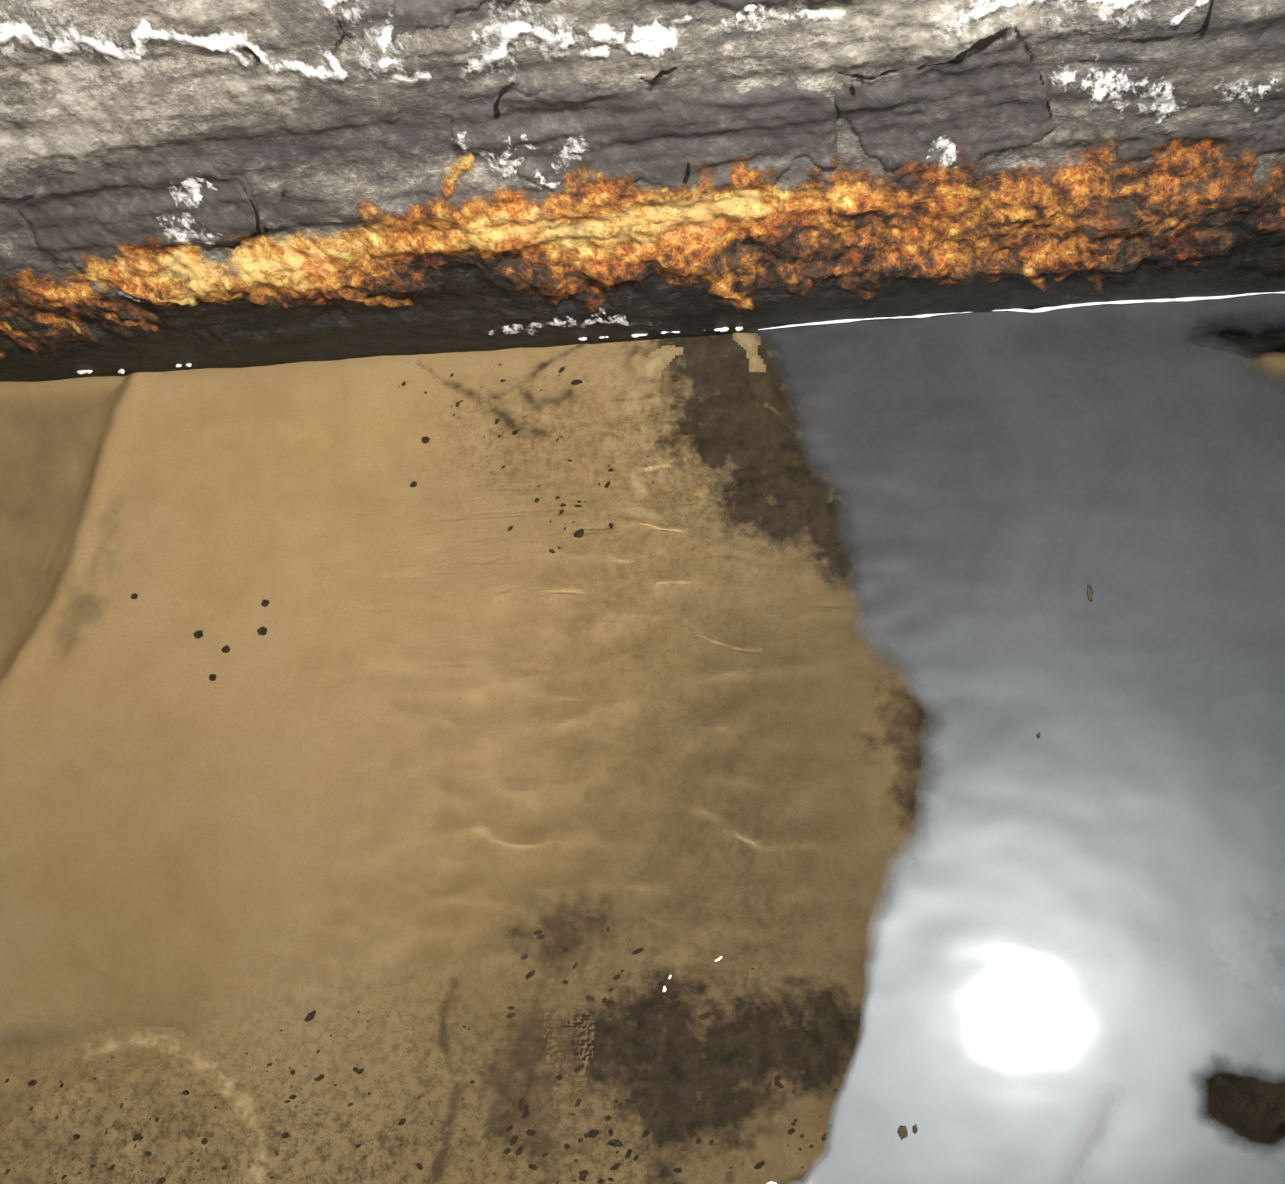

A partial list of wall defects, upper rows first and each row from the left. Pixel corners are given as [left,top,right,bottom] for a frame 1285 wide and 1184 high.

water stain [0,0,347,172]
water stain [325,0,430,83]
water stain [468,4,691,72]
crack [839,26,1051,117]
water stain [1089,0,1147,23]
water stain [1171,0,1208,25]
crack [1192,0,1214,37]
rust [0,139,1285,356]